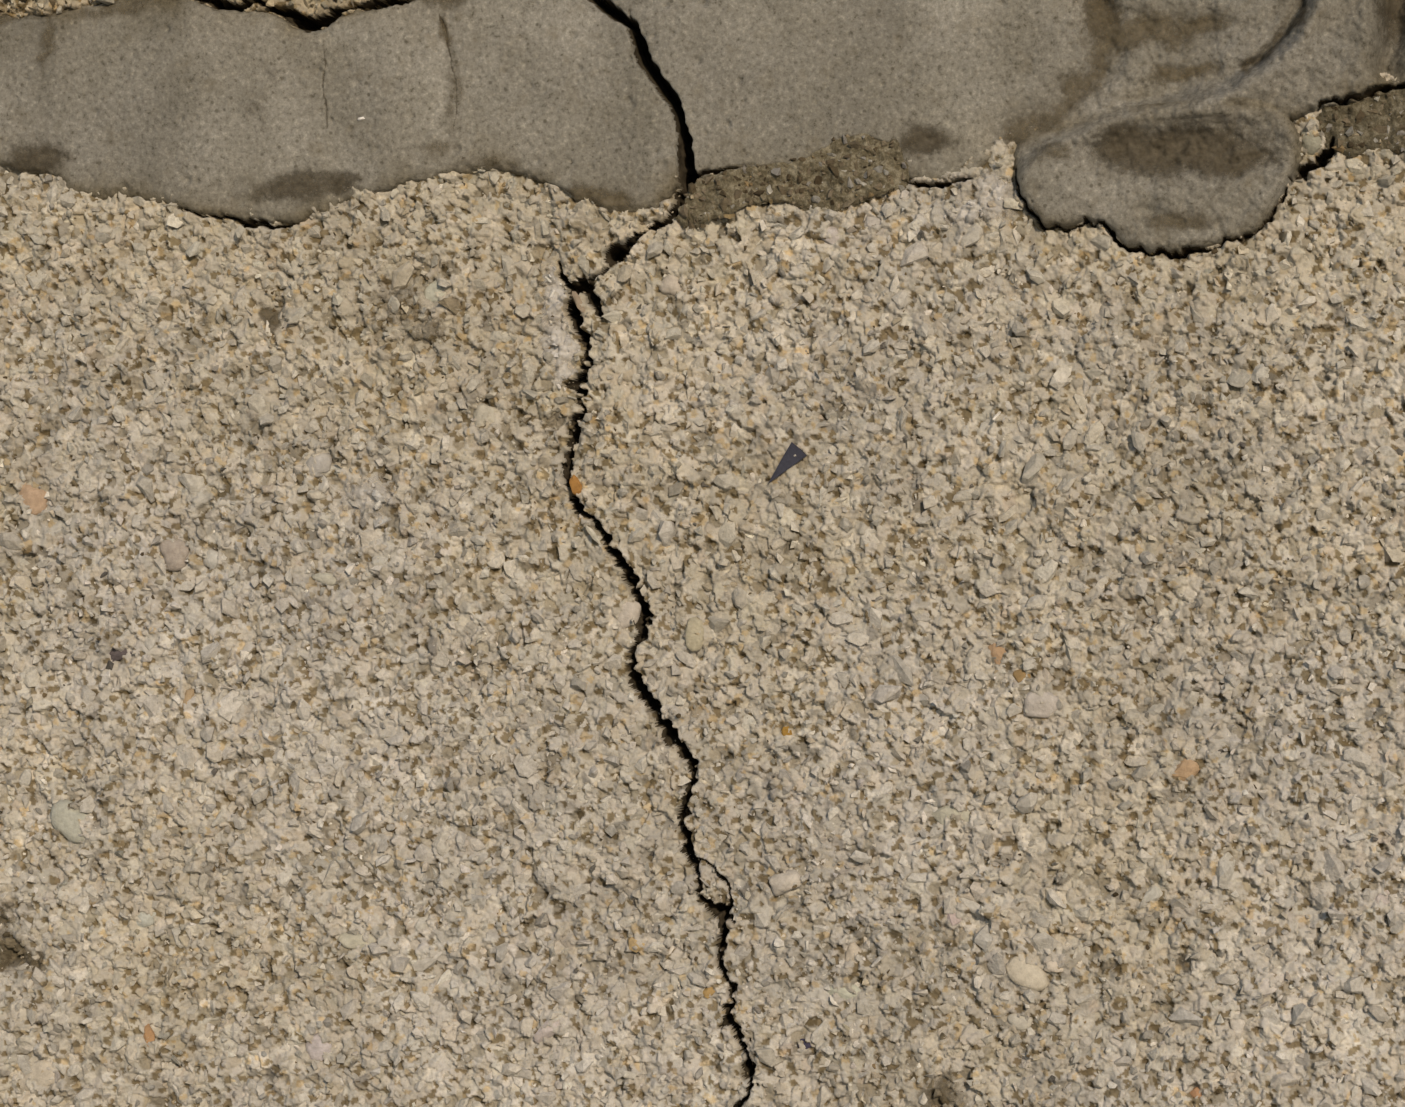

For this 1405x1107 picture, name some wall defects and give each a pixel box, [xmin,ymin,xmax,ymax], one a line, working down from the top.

crack [558,0,759,1107]